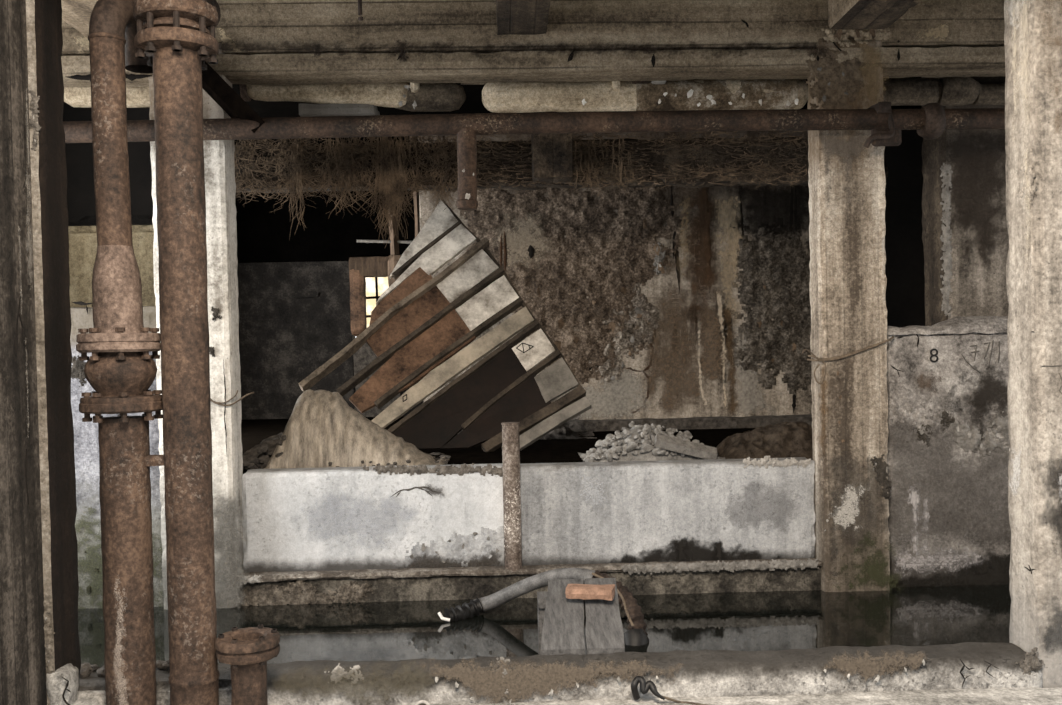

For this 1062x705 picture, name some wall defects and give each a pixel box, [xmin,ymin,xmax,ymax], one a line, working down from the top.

peeling [460,186,688,384]
corrosion [682,187,719,328]
corrosion [723,308,737,413]
leakage [945,362,1008,446]
leakage [621,538,819,575]
leakage [824,484,871,559]
leakage [1039,460,1062,549]